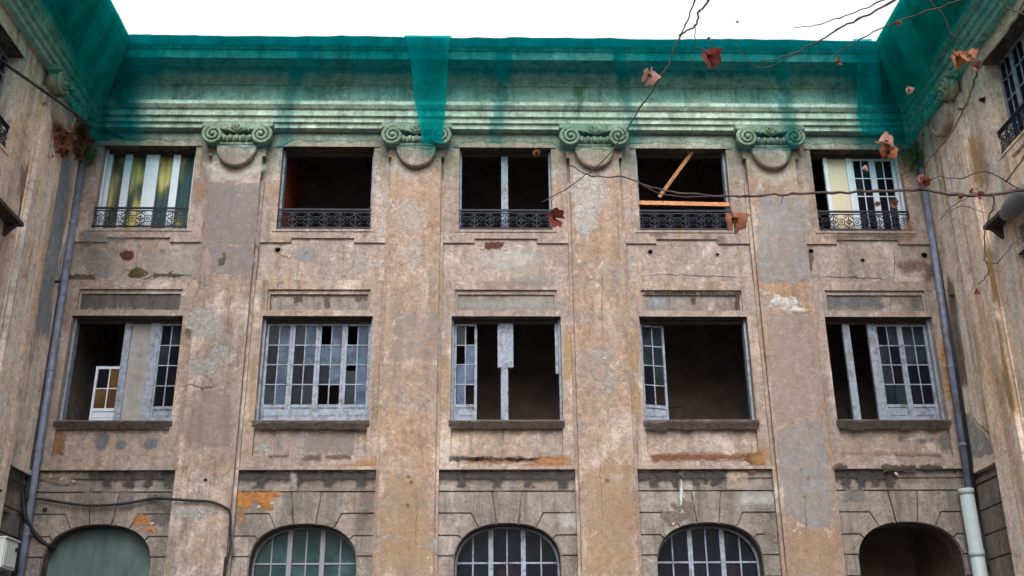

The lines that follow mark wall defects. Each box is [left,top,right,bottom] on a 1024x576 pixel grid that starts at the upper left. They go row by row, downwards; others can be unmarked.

spalling [481,241,508,250]
peeling [768,294,808,313]
spalling [53,430,69,456]
spalling [235,491,280,524]
spalling [133,513,157,534]